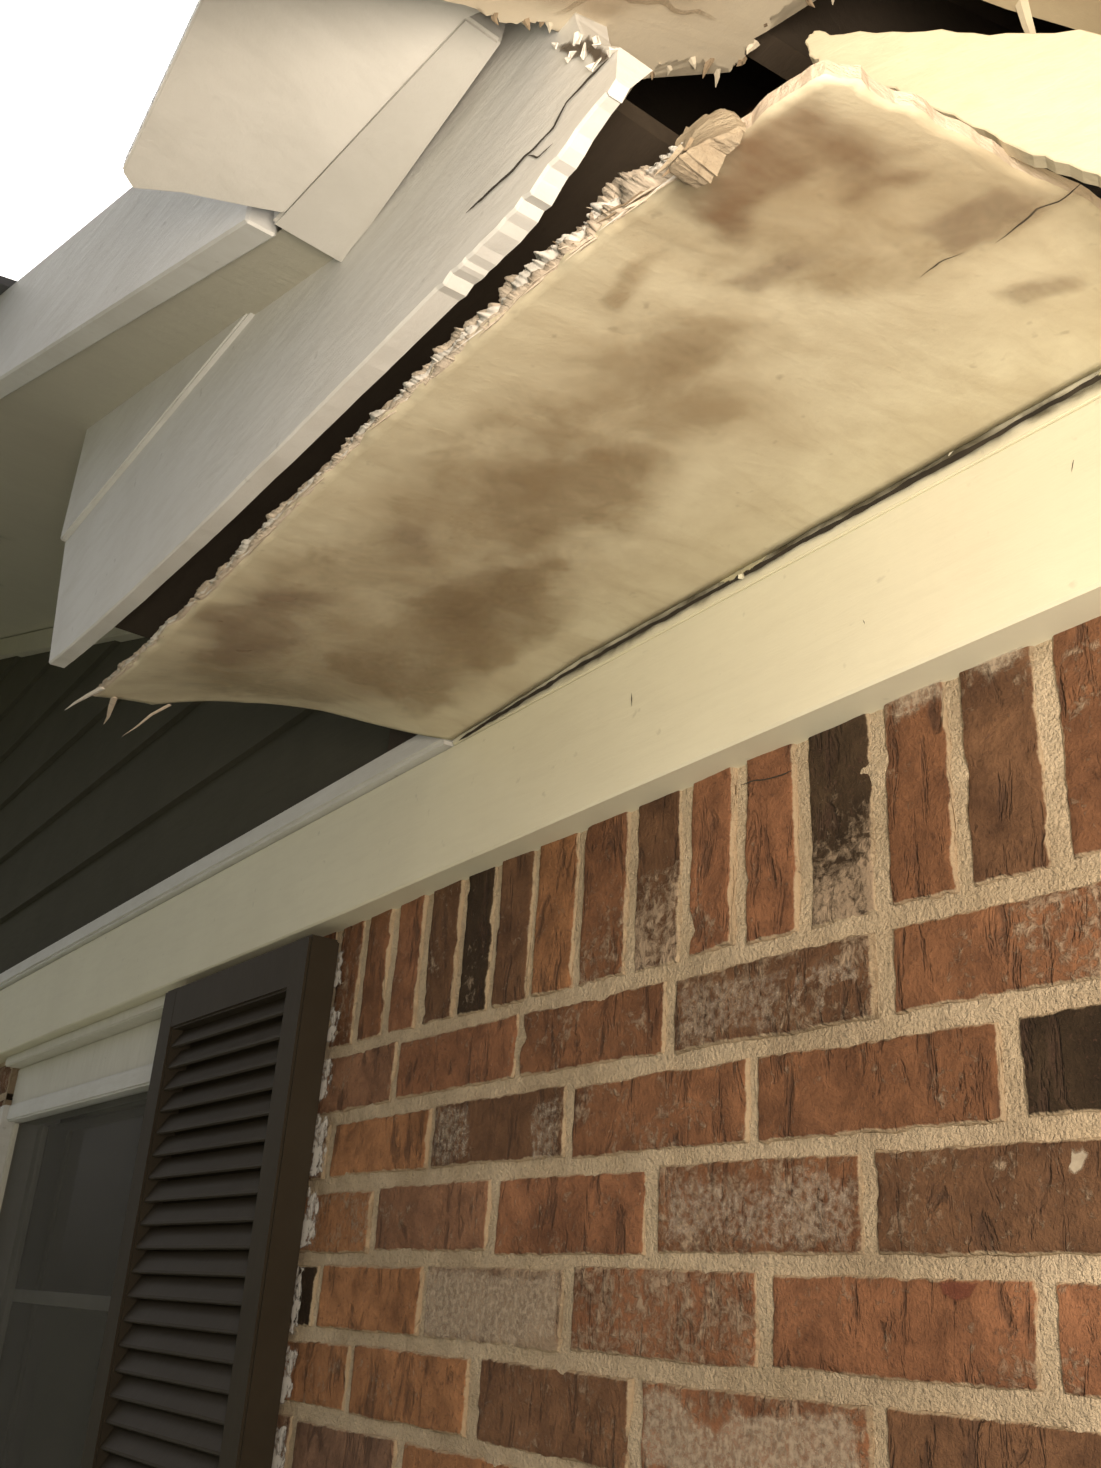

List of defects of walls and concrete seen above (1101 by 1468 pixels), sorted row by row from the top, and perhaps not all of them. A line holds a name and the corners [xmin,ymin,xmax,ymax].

peeling [551,31,618,72]
crack [466,59,608,213]
crack [459,374,1101,741]
leakage [771,434,988,557]